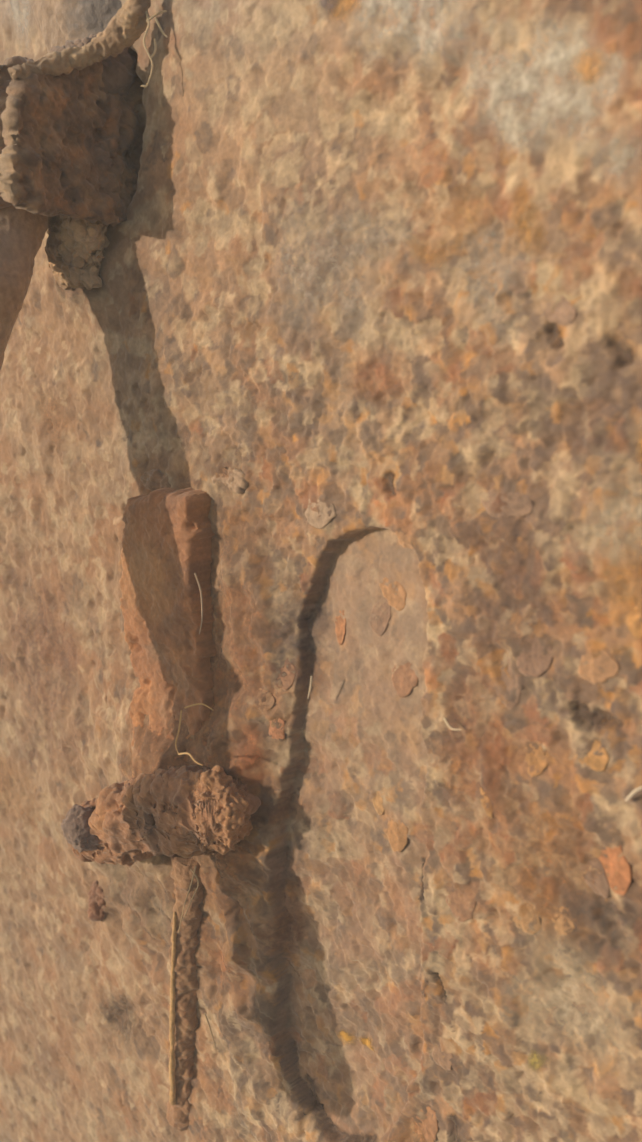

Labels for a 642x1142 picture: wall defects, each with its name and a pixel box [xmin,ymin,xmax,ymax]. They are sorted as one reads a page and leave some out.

corrosion [305,499,336,529]
corrosion [627,607,642,639]
corrosion [496,633,553,710]
corrosion [578,650,619,684]
corrosion [254,658,297,739]
corrosion [575,740,609,771]
corrosion [580,839,631,899]
corrosion [513,904,576,936]